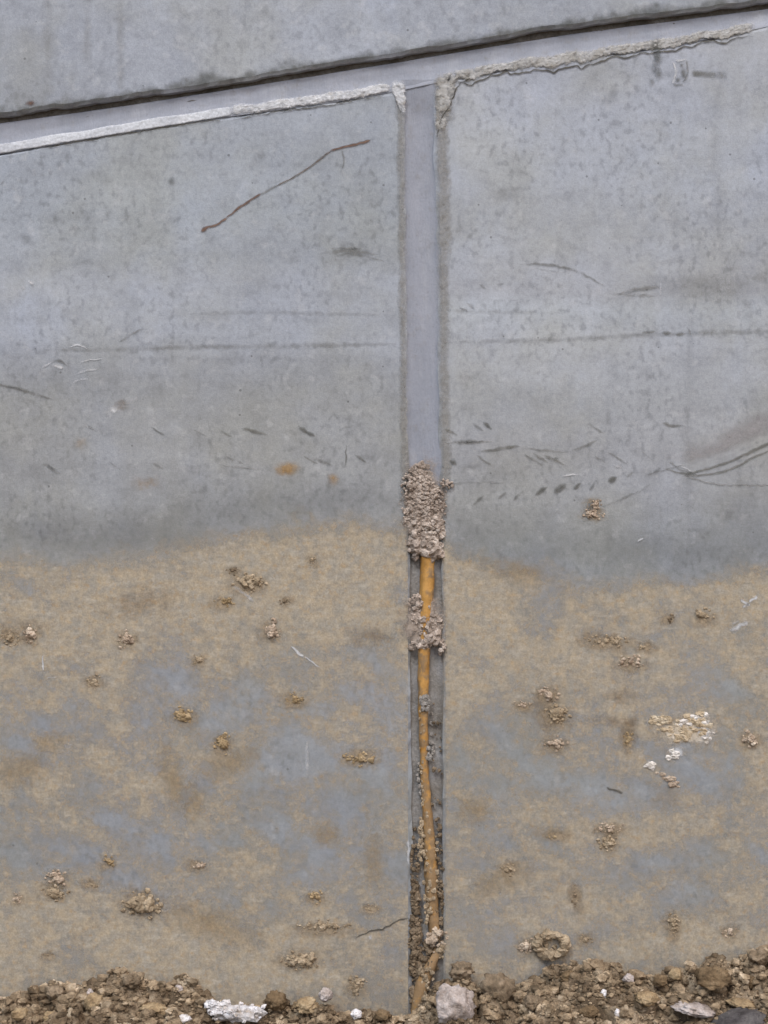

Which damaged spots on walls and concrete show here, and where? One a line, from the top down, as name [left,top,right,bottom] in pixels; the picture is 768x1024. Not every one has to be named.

corrosion [201,140,370,232]
crack [357,918,407,937]